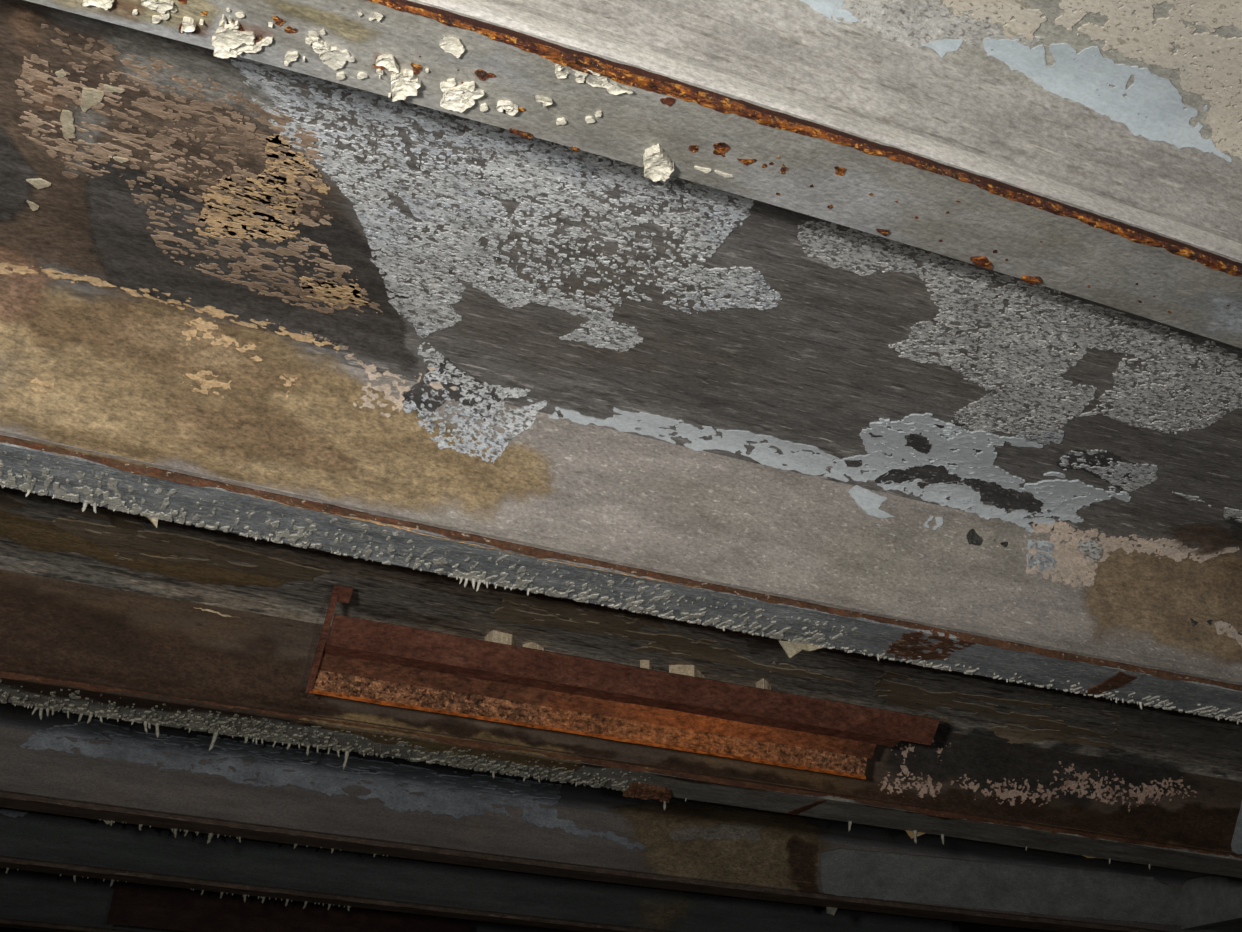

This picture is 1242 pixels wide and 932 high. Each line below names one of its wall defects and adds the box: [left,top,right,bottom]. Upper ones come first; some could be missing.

corrosion [272,16,298,33]
corrosion [367,0,1242,276]
damp [0,0,979,675]
peeling [0,0,1242,588]
corrosion [1022,276,1043,284]
corrosion [0,435,1242,694]
damp [1087,548,1242,661]
damp [0,679,650,791]
corrosion [0,588,1242,859]
damp [878,723,1197,812]
damp [993,673,1242,723]